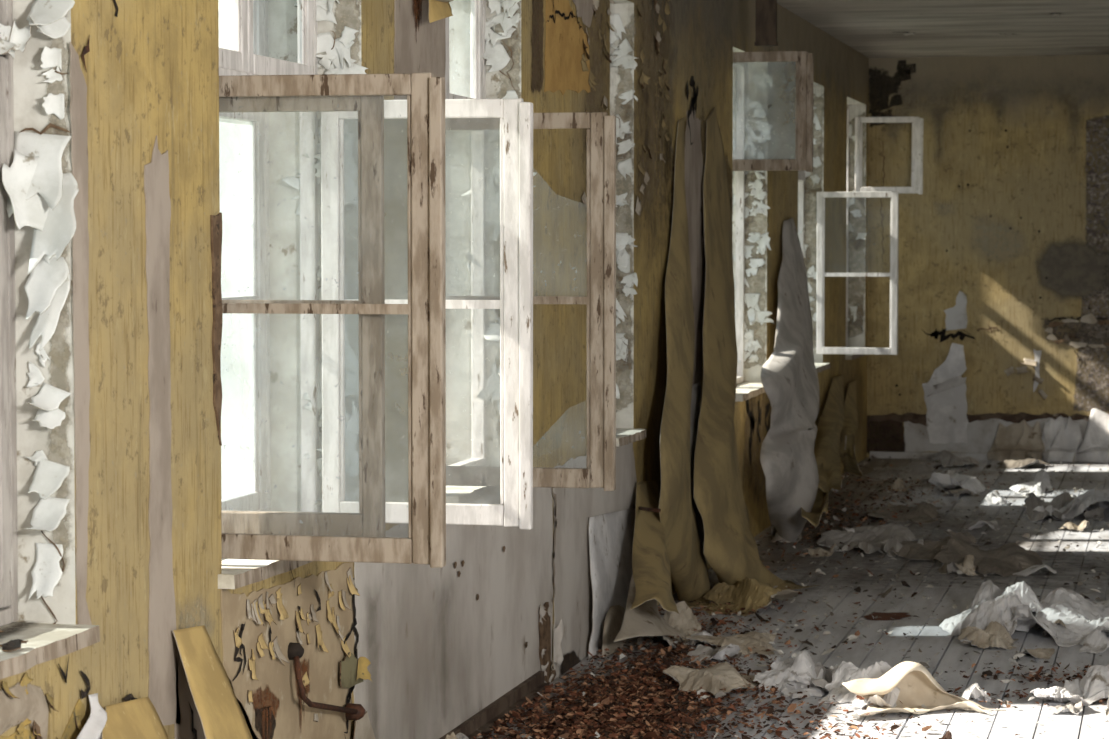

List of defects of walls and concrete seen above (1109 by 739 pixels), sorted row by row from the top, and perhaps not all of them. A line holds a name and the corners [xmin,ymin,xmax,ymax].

peeling [316,0,369,74]
flaking render [394,0,446,77]
peeling [483,0,521,99]
peeling [461,130,500,296]
peeling [0,0,92,625]
peeling [467,309,500,445]
crack [922,325,1001,342]
flaking render [1004,268,1109,439]
water stain [1037,242,1109,299]
flaking render [904,418,1014,453]
flaking render [220,443,637,739]
peeling [56,699,86,739]